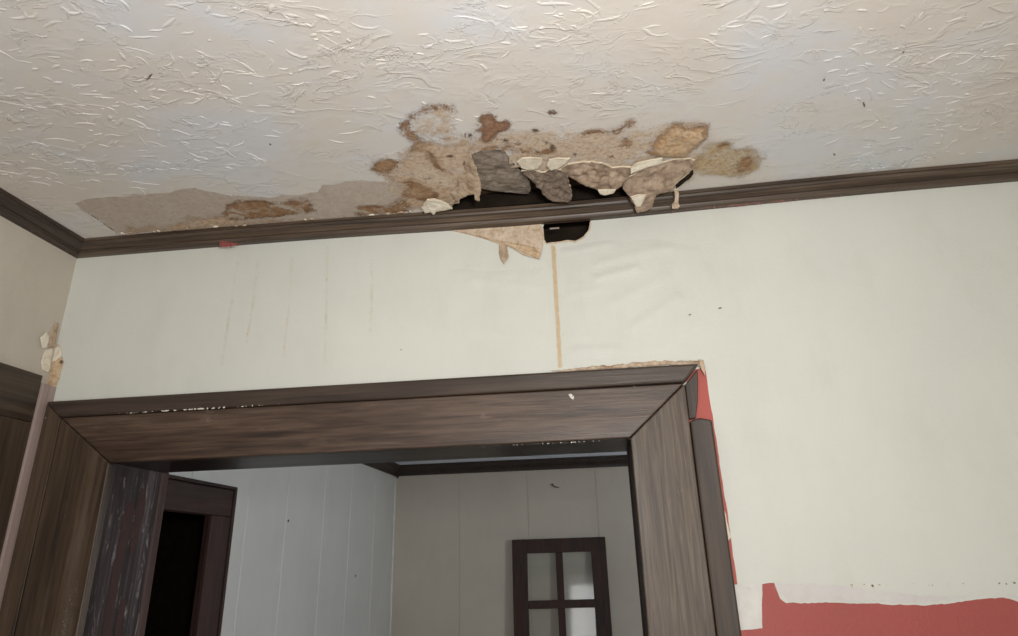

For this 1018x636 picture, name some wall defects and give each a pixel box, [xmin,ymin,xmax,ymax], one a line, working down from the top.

flaking render [421,149,695,215]
spalling [542,221,591,244]
peeling [40,322,64,387]